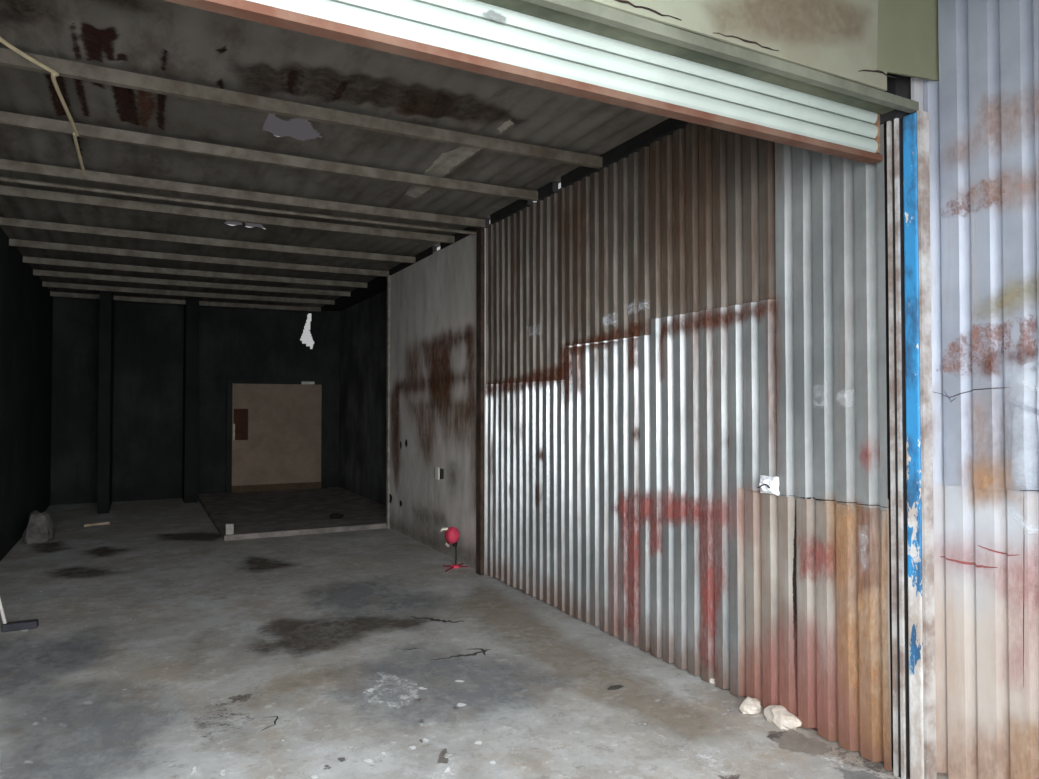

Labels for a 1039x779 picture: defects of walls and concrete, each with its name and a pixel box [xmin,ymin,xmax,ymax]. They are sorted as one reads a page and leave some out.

corrosion [70,23,126,62]
corrosion [45,74,166,130]
corrosion [951,176,1039,214]
corrosion [392,304,776,477]
leakage [261,583,434,653]
corrosion [844,574,887,737]
spalling [438,748,451,773]